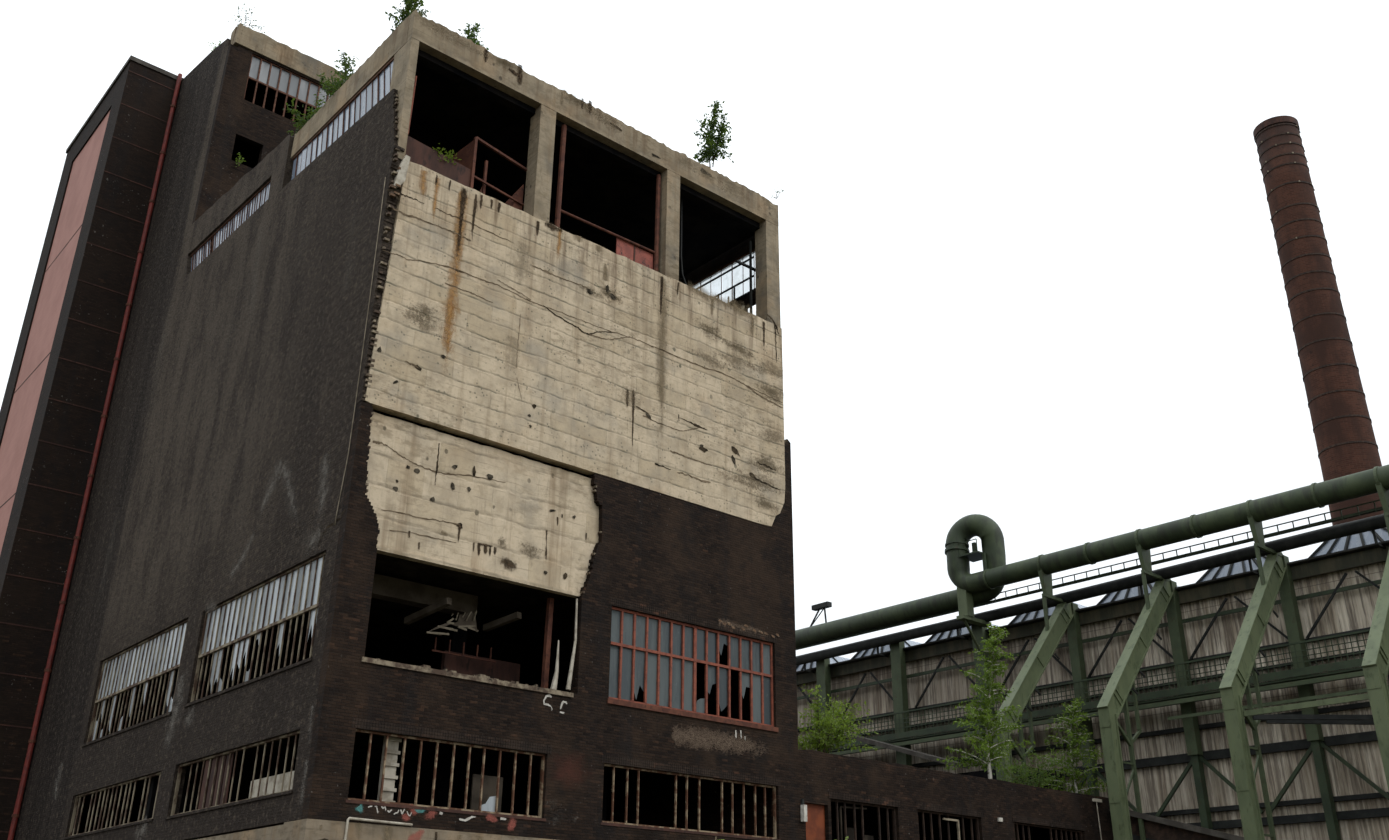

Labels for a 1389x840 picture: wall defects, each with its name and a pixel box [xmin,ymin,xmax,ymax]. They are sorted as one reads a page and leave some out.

spalling [364,94,410,454]
corrosion [445,188,467,351]
crack [383,189,783,408]
crack [373,440,506,483]
spalling [451,465,493,492]
spalling [731,446,785,502]
crack [381,509,460,543]
spalling [718,619,779,638]